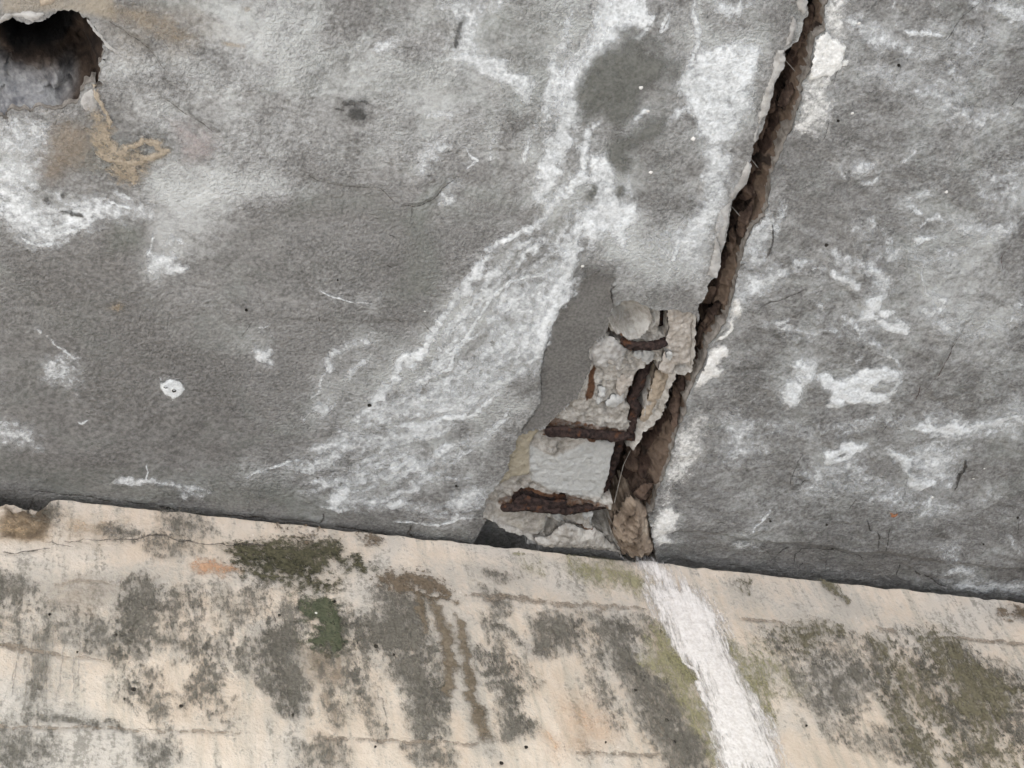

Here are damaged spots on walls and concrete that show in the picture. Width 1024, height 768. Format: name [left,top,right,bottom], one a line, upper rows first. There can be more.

hole [0,0,119,116]
leakage [0,119,152,247]
leakage [54,83,170,170]
leakage [247,0,760,546]
crack [611,0,823,518]
spalling [483,272,696,557]
efflorescence [723,421,768,462]
leakage [0,552,782,768]
leakage [755,615,1024,768]
leakage [944,547,1024,622]